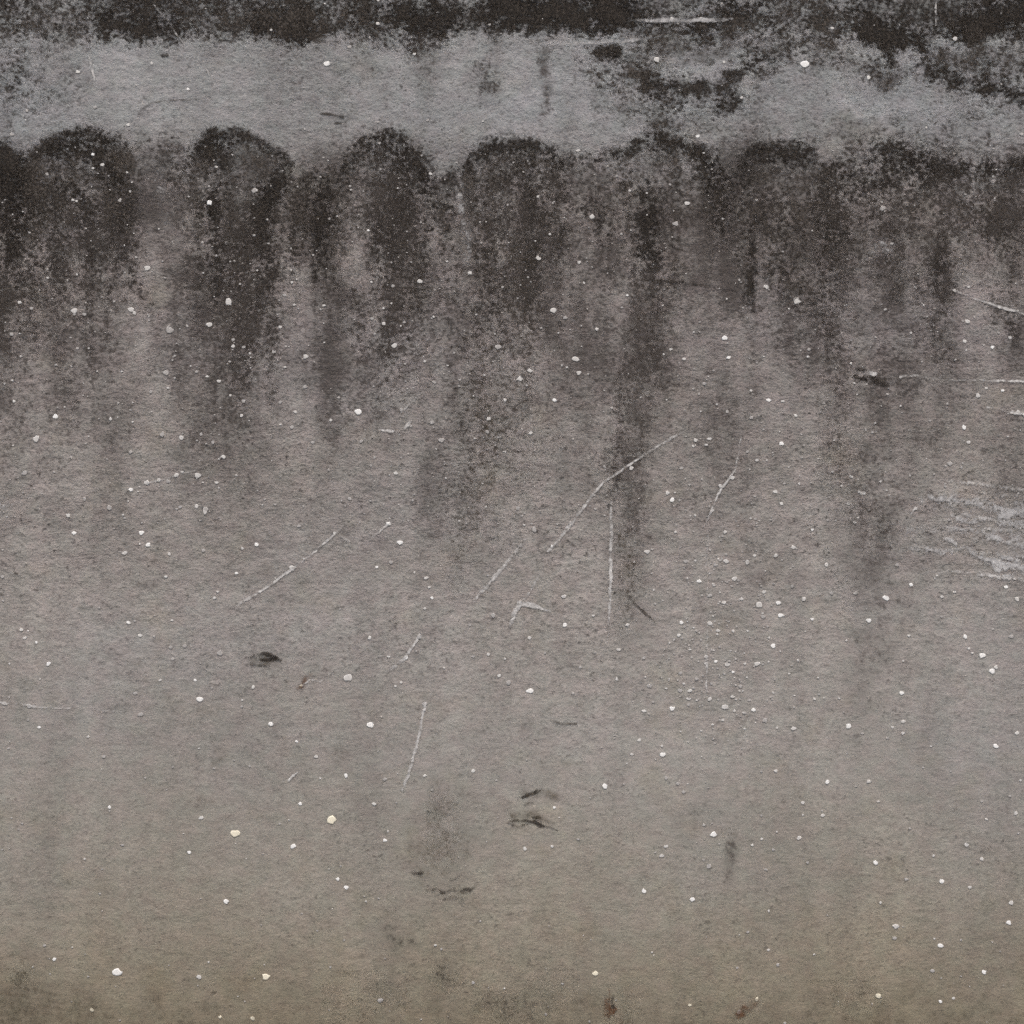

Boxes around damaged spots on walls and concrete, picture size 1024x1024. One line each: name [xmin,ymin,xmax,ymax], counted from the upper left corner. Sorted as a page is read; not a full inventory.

leakage [0,0,1024,533]
leakage [928,487,1024,581]